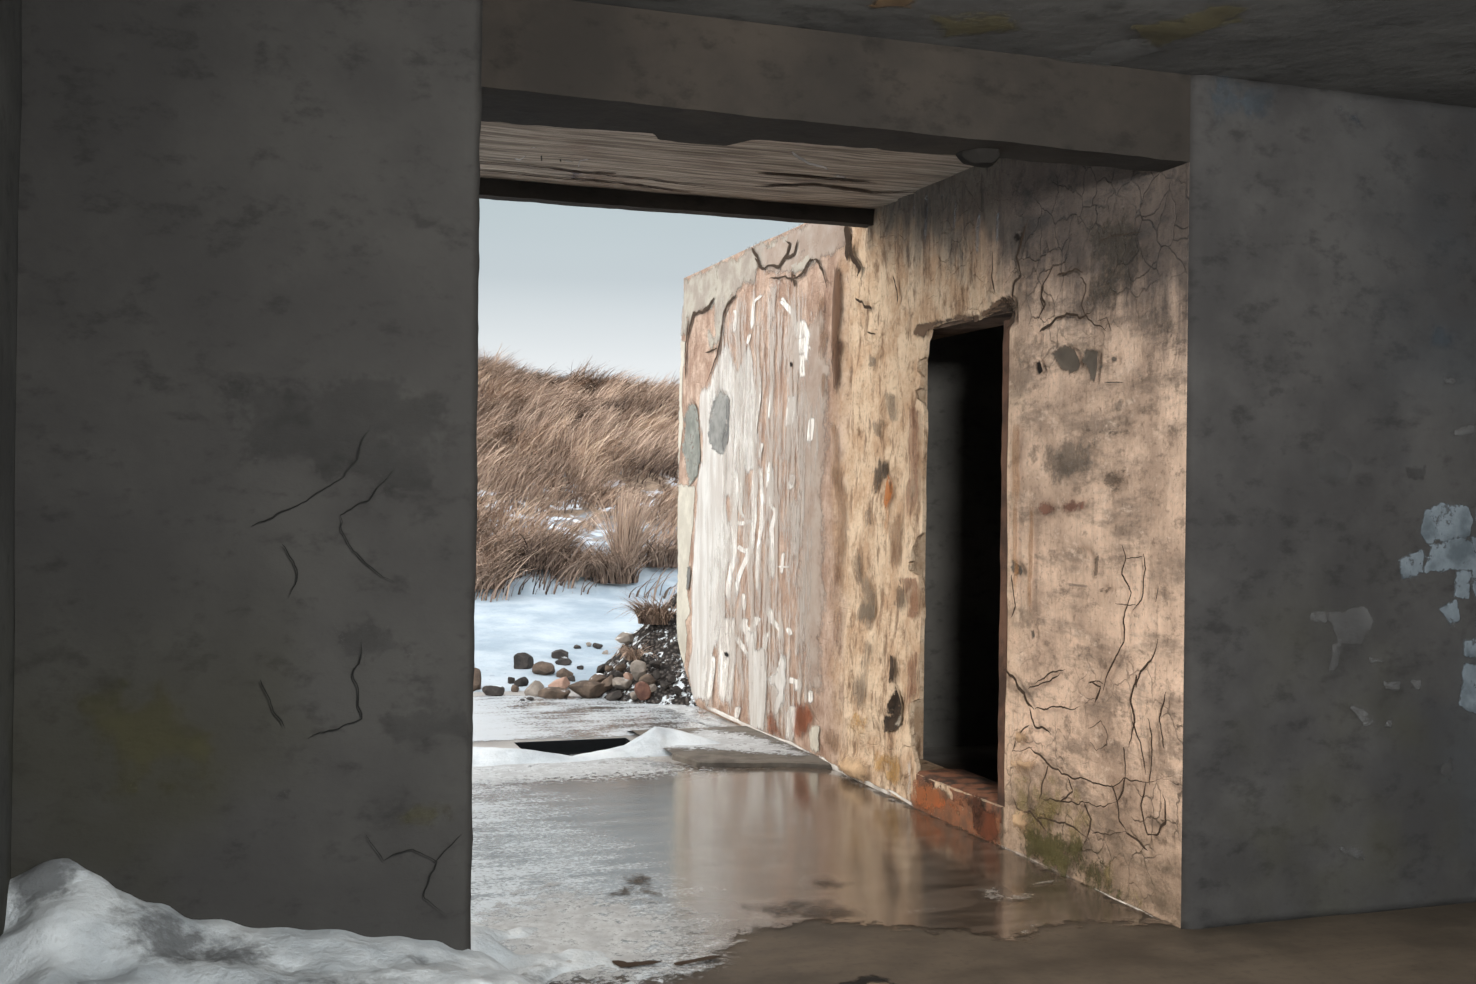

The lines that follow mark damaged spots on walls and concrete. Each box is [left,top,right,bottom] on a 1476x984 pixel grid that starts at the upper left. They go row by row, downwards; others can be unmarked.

crack [480,161,703,193]
crack [755,173,916,194]
crack [751,226,898,335]
crack [991,220,1111,332]
crack [685,295,736,381]
spalling [1036,345,1123,383]
spalling [682,391,730,487]
spalling [906,407,919,512]
peeling [1400,503,1476,714]
spalling [884,653,917,732]
crack [1004,545,1167,851]
corrosion [911,778,1001,844]